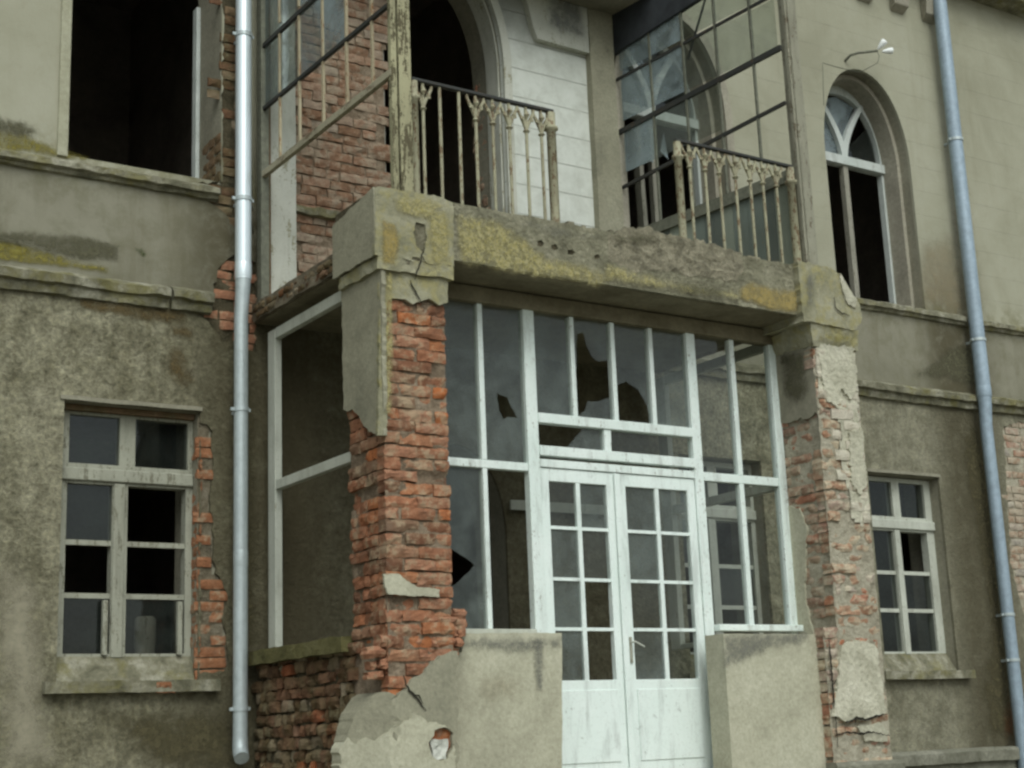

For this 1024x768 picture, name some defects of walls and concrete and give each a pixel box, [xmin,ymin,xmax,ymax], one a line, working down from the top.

flaking render [201,0,236,226]
damp [0,233,117,271]
flaking render [200,255,235,342]
flaking render [248,261,257,352]
crack [410,247,426,303]
damp [396,198,812,311]
flaking render [190,417,228,680]
flaking render [251,223,467,768]
flaking render [775,344,893,763]
flaking render [1001,422,1024,611]